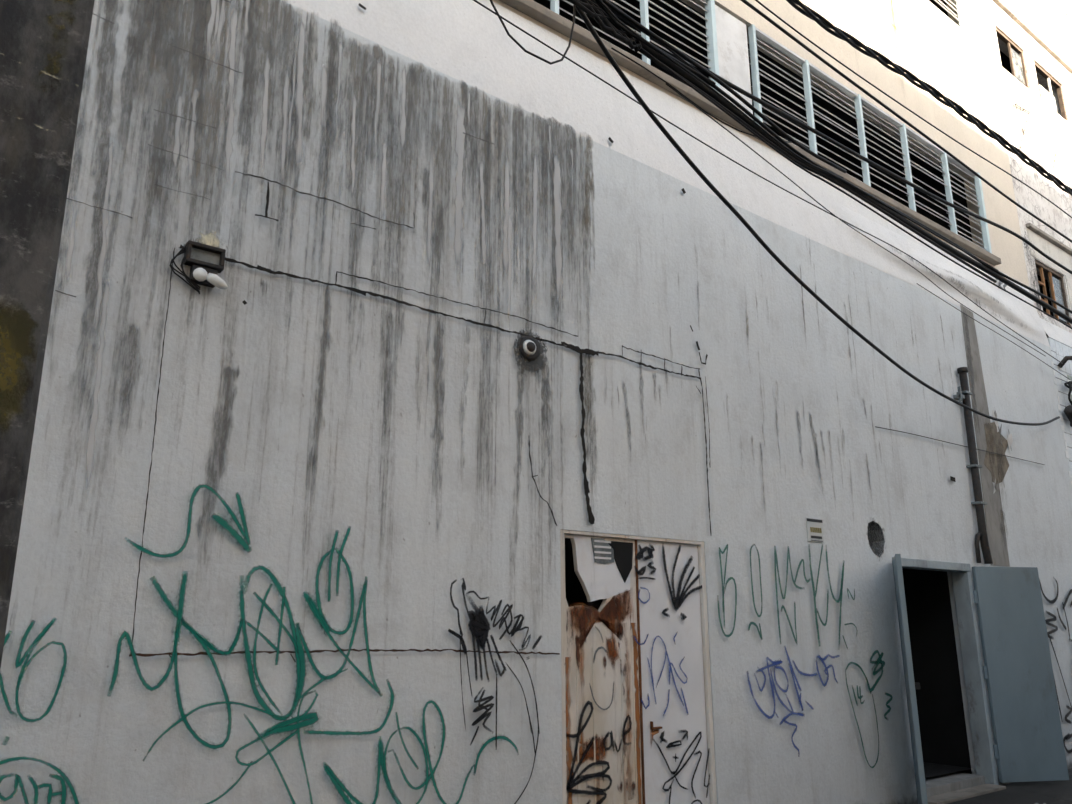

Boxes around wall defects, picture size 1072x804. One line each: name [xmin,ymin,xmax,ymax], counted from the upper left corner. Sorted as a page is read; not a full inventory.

damp [55,0,594,496]
damp [198,353,239,535]
crack [225,257,711,534]
peeling [960,304,1013,567]
rust [565,591,659,804]